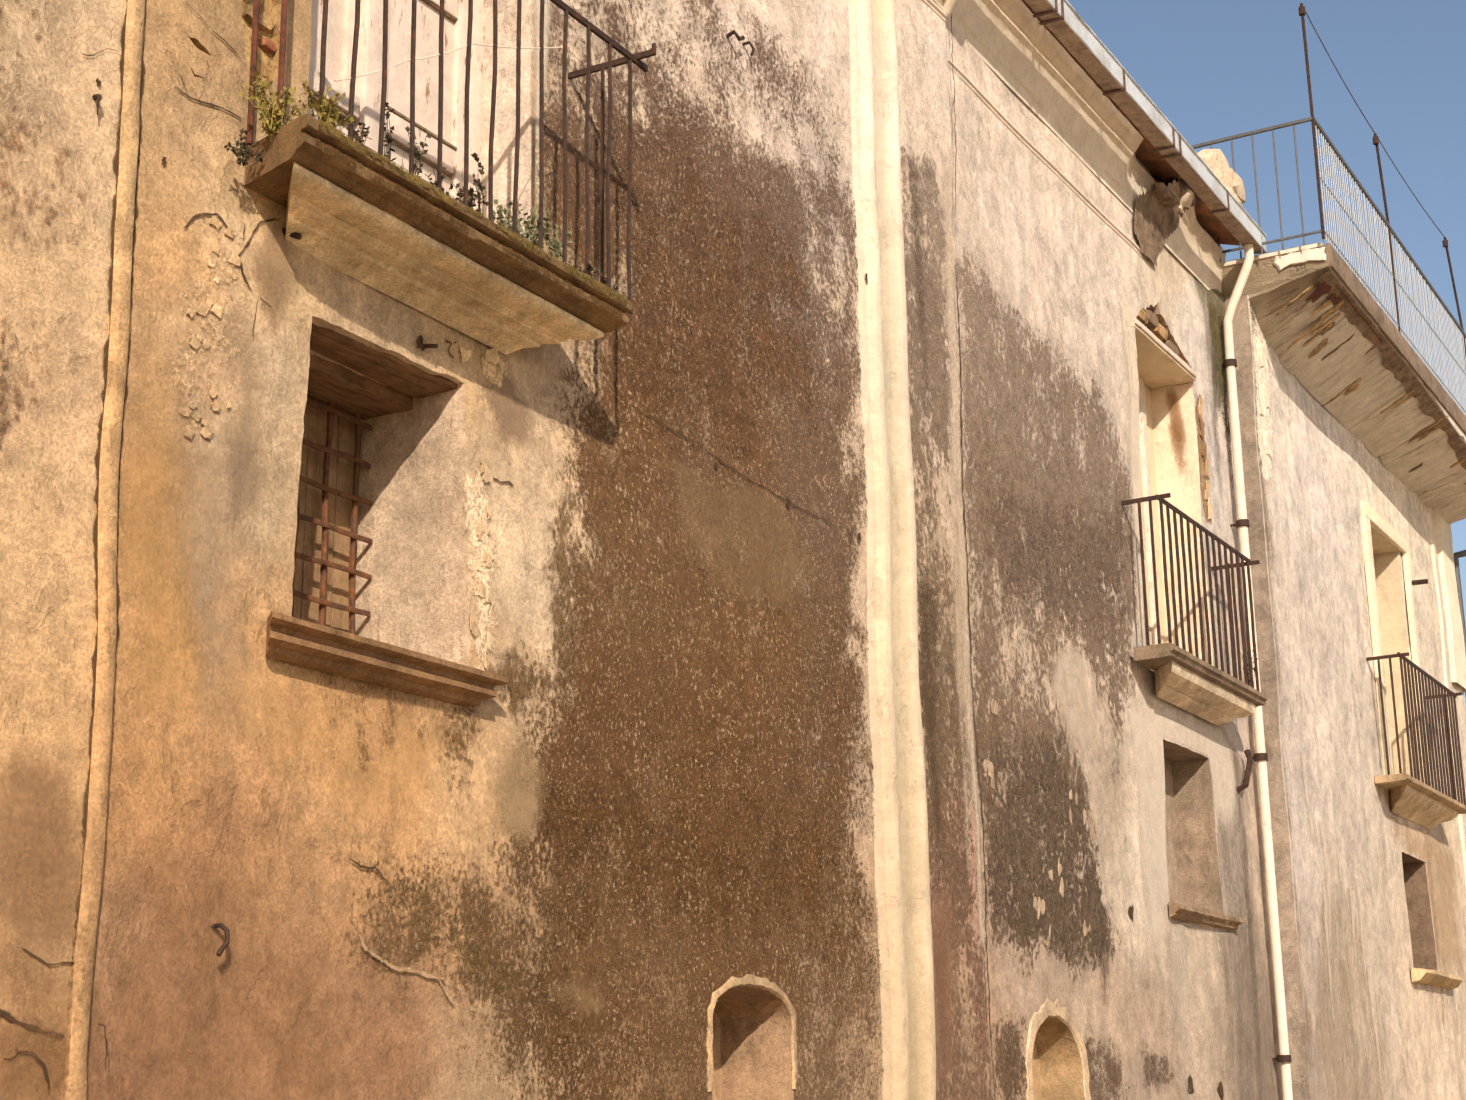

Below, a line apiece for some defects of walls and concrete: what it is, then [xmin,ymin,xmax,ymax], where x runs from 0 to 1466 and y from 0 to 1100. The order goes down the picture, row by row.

crack [0,0,243,1088]
peeling [168,195,253,440]
crack [184,213,276,341]
leakage [312,0,884,1100]
leakage [901,146,1137,1100]
spalling [1252,247,1466,487]